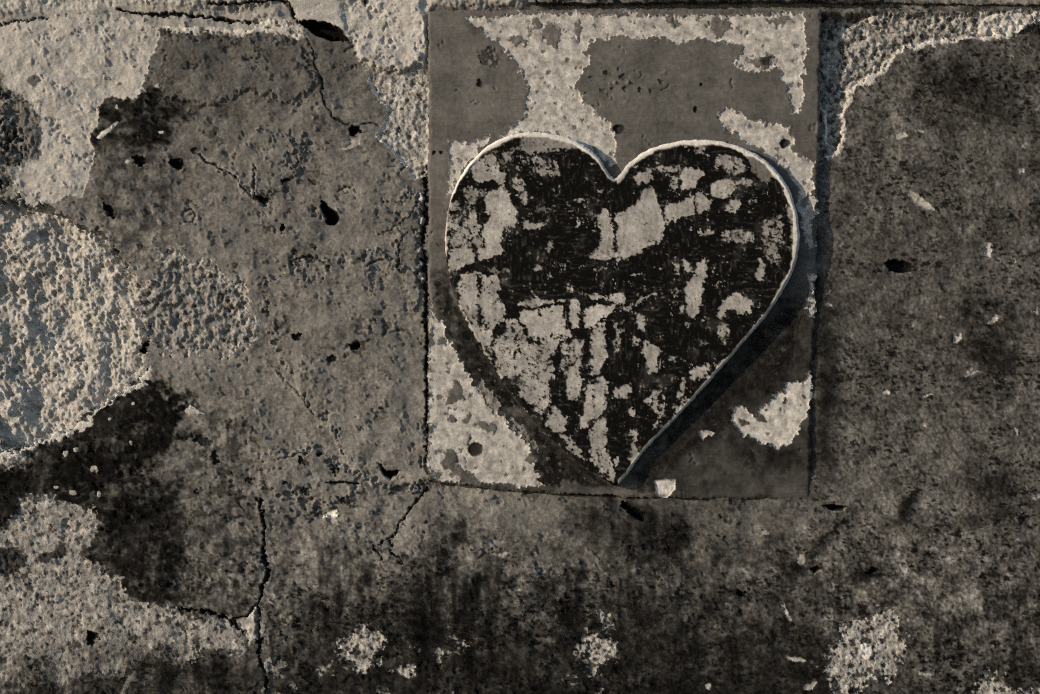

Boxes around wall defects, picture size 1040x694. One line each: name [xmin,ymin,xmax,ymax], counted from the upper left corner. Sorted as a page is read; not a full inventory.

crack [117,0,299,25]
flaking render [0,12,306,471]
crack [198,153,267,207]
peeling [363,8,1040,248]
leakage [0,371,195,612]
crack [180,498,271,690]
crack [372,480,432,564]
peeling [426,306,545,488]
leakage [277,513,827,694]
leakage [433,271,798,567]
peeling [731,371,813,450]
leakage [894,494,915,524]